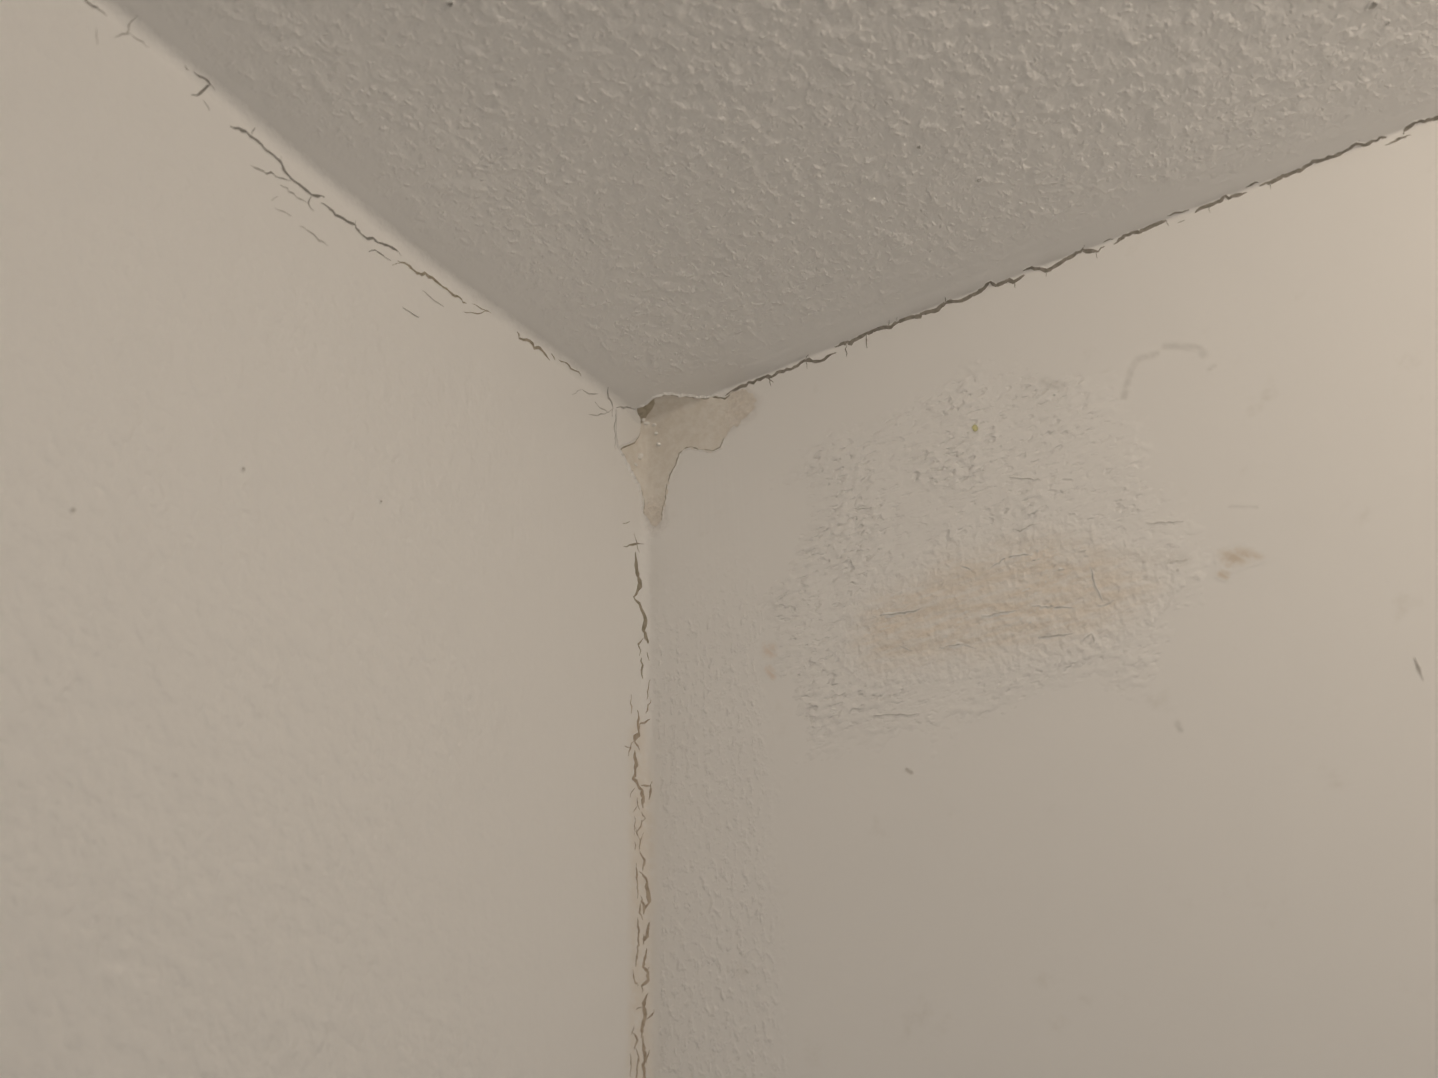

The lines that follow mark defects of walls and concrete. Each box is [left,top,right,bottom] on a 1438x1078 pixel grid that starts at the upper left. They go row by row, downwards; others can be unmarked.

crack [82,0,149,48]
crack [185,65,634,449]
crack [724,116,1438,396]
spalling [616,389,757,527]
crack [619,521,664,1078]